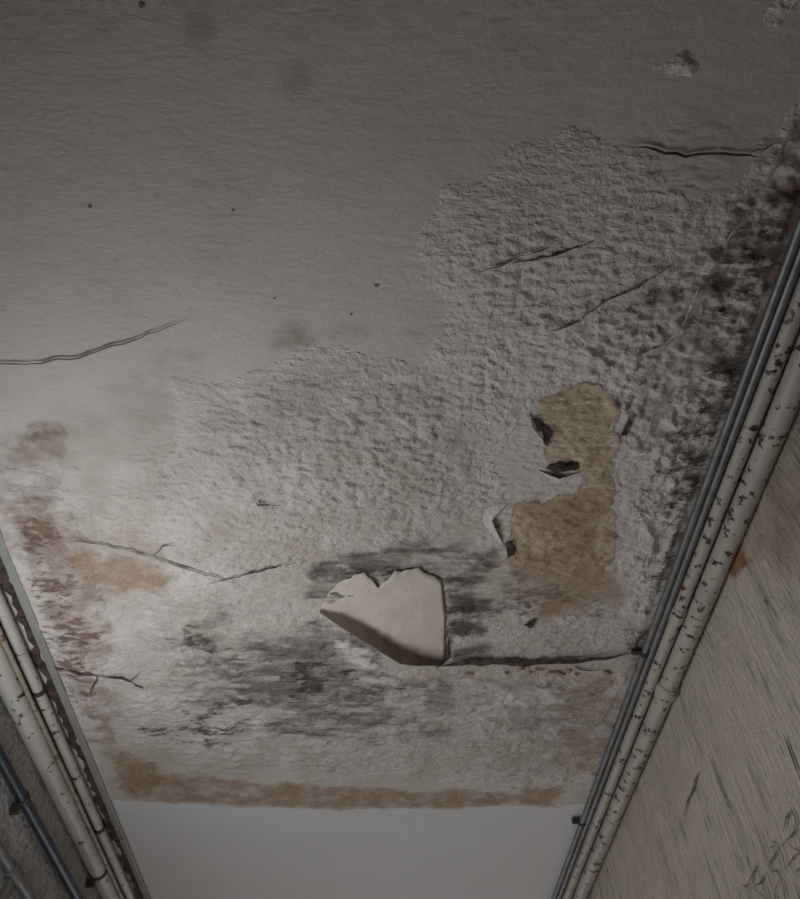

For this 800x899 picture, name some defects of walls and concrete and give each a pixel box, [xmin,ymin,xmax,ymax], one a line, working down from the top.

peeling [653,49,699,77]
crack [618,141,781,159]
mould [682,186,800,300]
crack [0,317,191,365]
flaking render [482,97,800,640]
mould [649,307,753,509]
damp [31,556,163,696]
damp [182,626,214,653]
damp [138,642,393,748]
peeling [102,567,632,800]
damp [308,545,455,598]
damp [445,554,608,637]